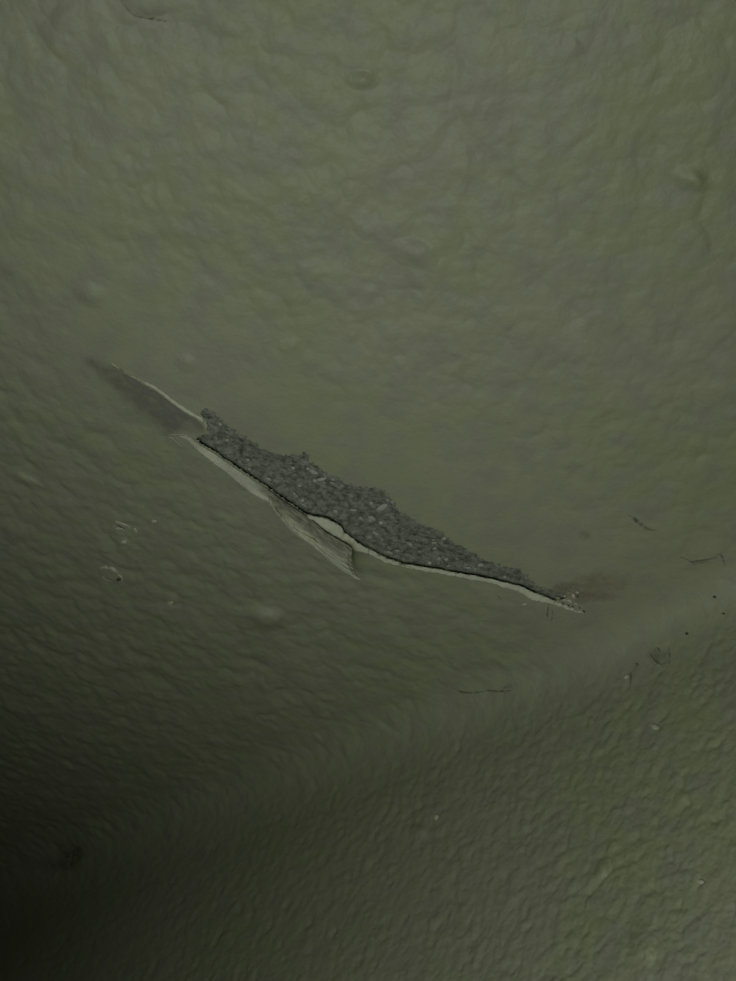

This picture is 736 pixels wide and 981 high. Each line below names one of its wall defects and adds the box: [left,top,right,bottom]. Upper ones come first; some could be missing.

peeling [112,363,585,613]